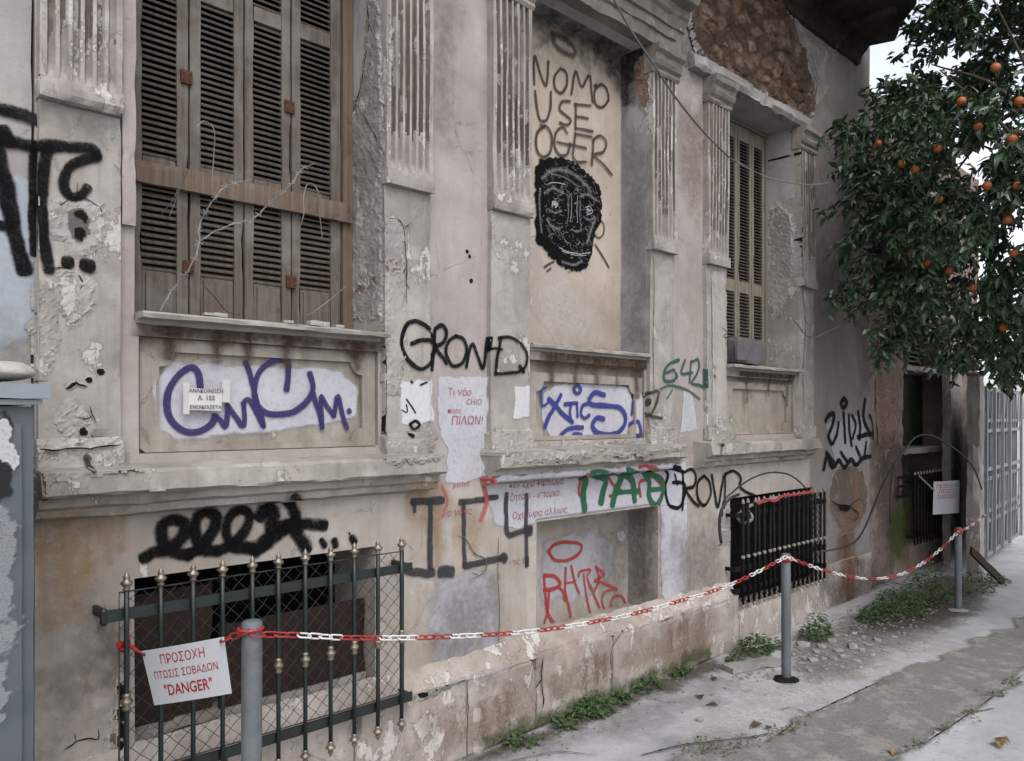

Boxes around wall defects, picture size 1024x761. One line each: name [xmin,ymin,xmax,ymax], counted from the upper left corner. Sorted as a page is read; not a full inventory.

flaking render [790,15,838,107]
spalling [24,196,110,381]
spalling [352,0,408,396]
peeling [767,196,809,437]
crack [535,658,545,715]